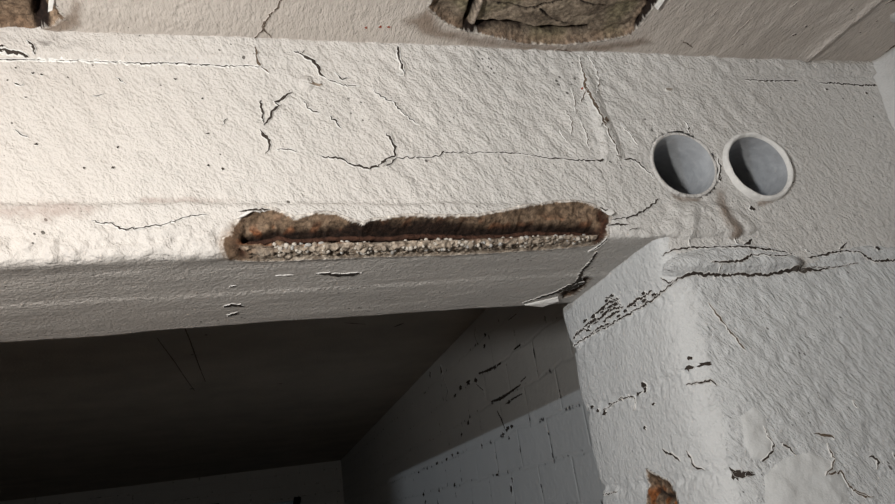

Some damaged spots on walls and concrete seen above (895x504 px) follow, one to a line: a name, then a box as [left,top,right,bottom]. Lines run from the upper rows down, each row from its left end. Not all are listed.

crack [0,0,282,74]
crack [293,50,420,126]
crack [396,45,405,76]
spalling [426,0,664,52]
crack [259,92,342,154]
crack [315,55,659,303]
crack [91,213,208,232]
spalling [218,199,615,262]
crack [660,238,895,284]
crack [708,302,746,352]
crack [761,426,796,462]
crack [815,432,895,499]